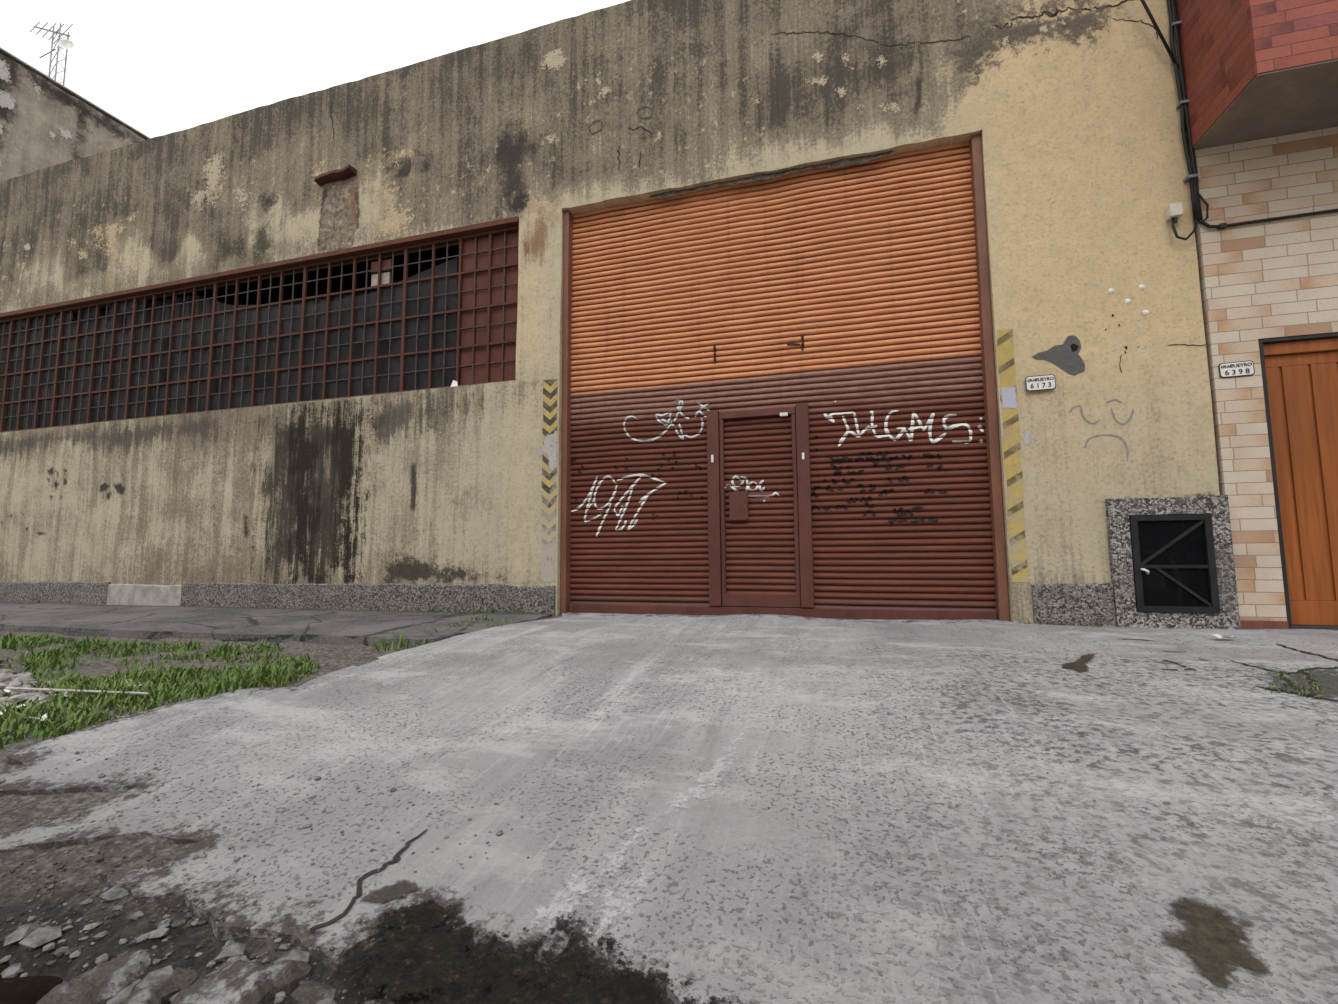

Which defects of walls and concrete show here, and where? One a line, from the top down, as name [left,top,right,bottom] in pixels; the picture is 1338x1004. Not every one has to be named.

crack [771,0,1158,49]
peeling [0,59,16,135]
damp [913,41,923,113]
peeling [47,126,74,140]
damp [386,158,428,179]
damp [243,387,484,584]
damp [383,553,507,584]